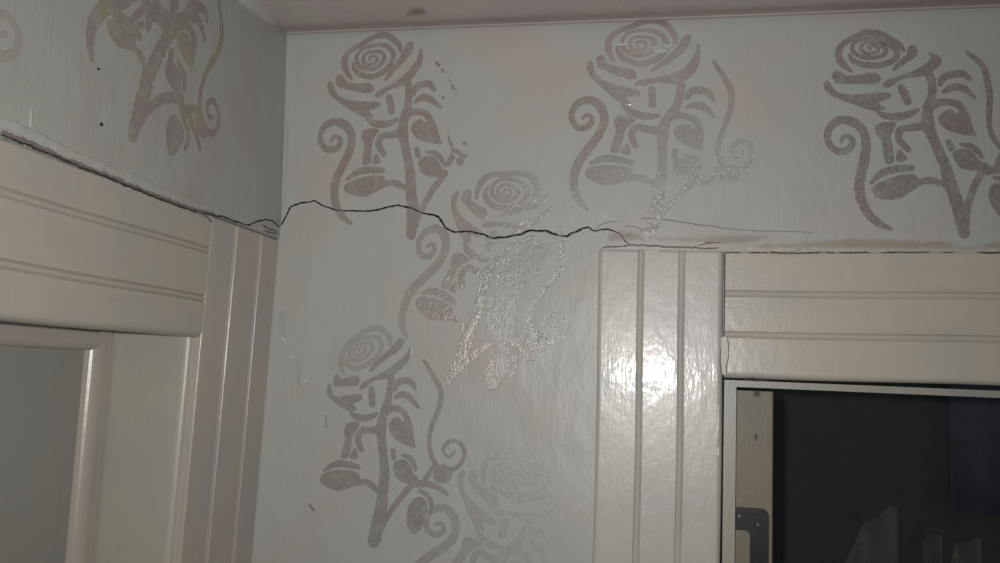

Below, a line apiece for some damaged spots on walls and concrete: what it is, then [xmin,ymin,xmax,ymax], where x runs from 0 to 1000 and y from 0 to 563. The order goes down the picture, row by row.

crack [0,130,1000,254]